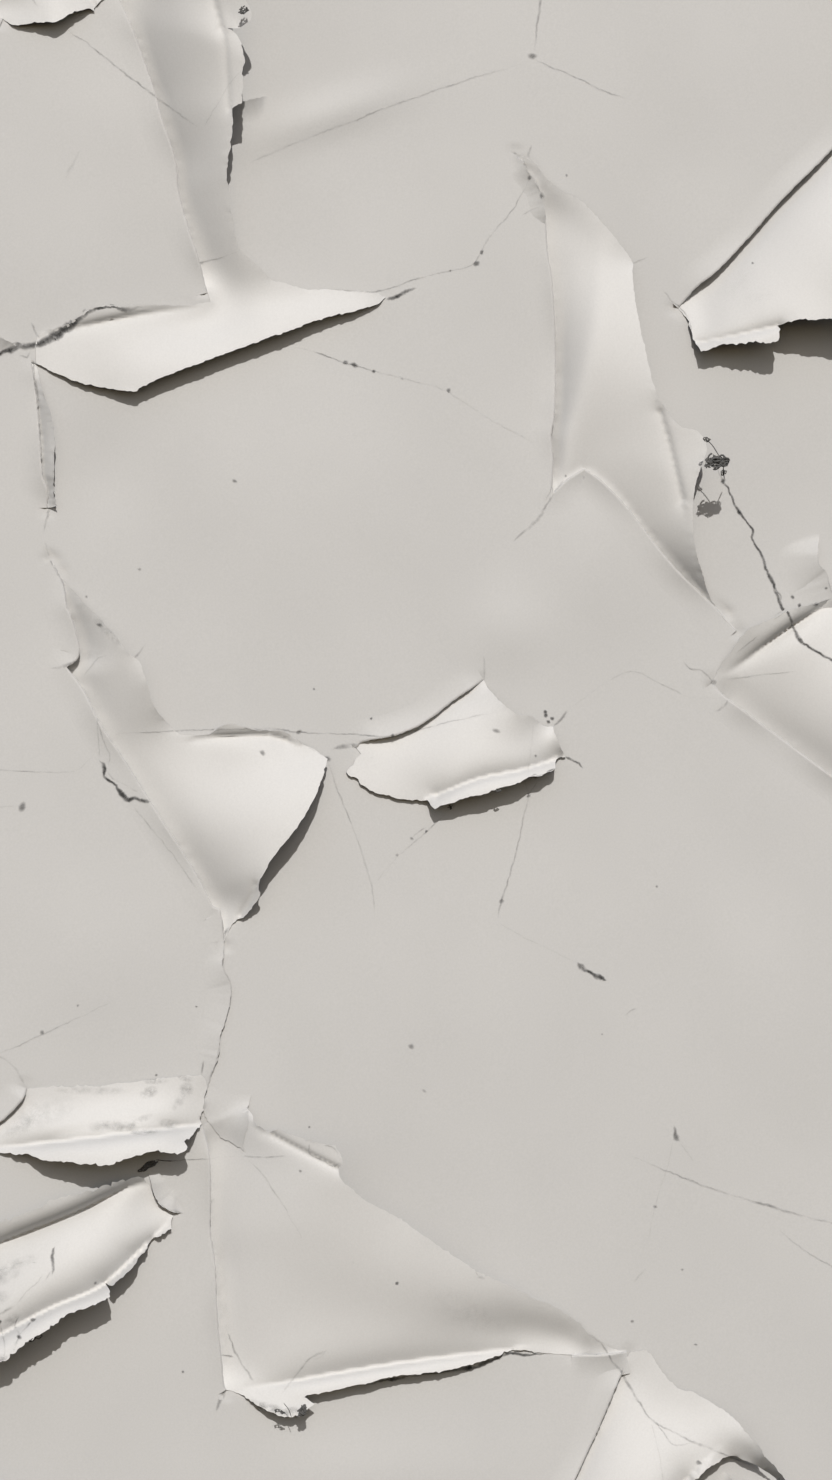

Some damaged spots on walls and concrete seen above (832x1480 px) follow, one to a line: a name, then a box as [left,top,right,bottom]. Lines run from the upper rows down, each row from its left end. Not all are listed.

crack [0,306,124,355]
peeling [32,561,327,943]
peeling [0,0,386,508]
peeling [338,661,566,809]
peeling [502,152,832,803]
peeling [661,114,832,351]
crack [722,480,832,661]
peeling [0,1075,785,1480]